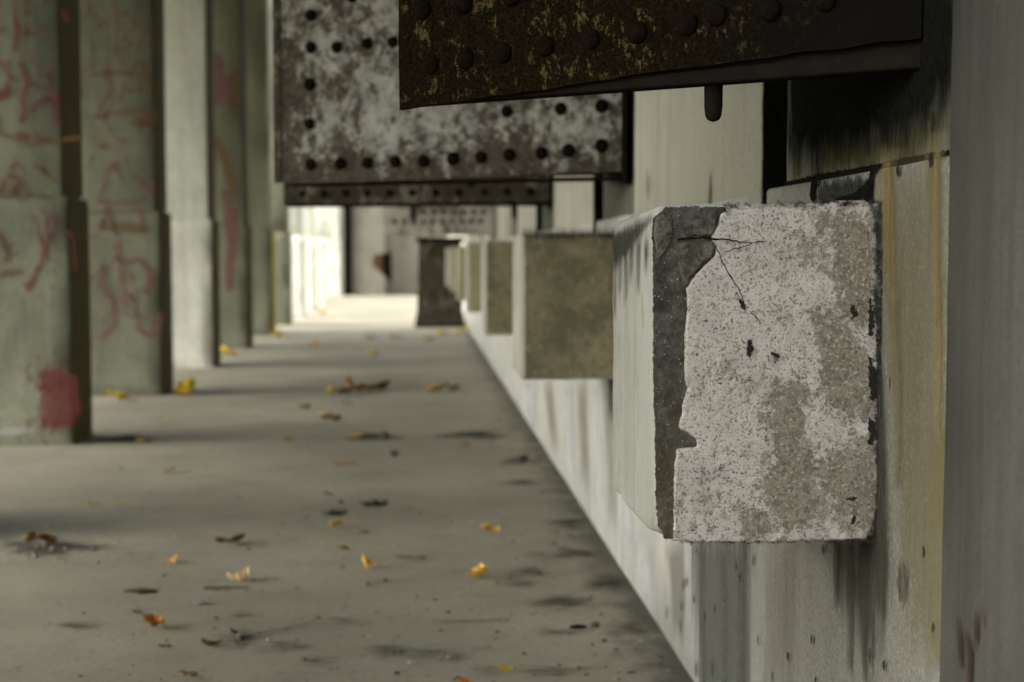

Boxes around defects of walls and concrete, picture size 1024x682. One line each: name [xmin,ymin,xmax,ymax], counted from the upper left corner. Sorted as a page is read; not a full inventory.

spalling [651,205,727,539]
crack [677,237,765,324]
rust [881,168,896,350]
damp [828,375,885,675]